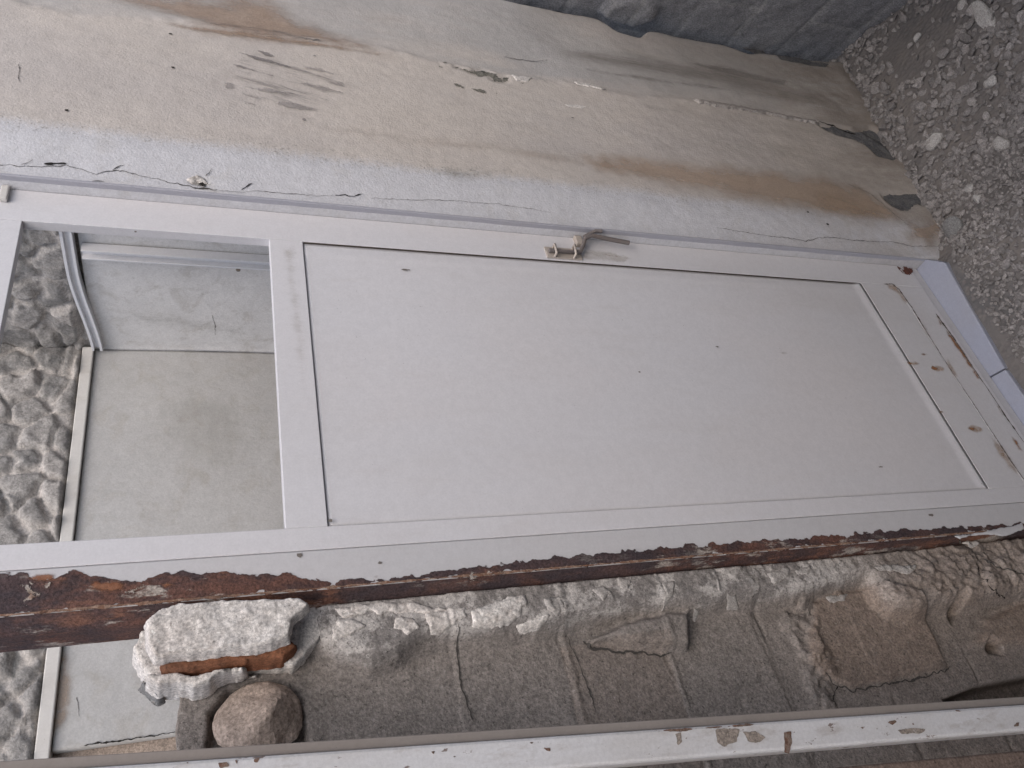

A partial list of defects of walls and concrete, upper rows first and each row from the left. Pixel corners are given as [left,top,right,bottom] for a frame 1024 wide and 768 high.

leakage [137,0,342,75]
spalling [439,62,532,94]
spalling [820,121,896,160]
crack [7,159,546,212]
leakage [602,163,938,238]
spalling [883,194,921,211]
rust [887,283,1024,479]
rust [0,522,1024,653]